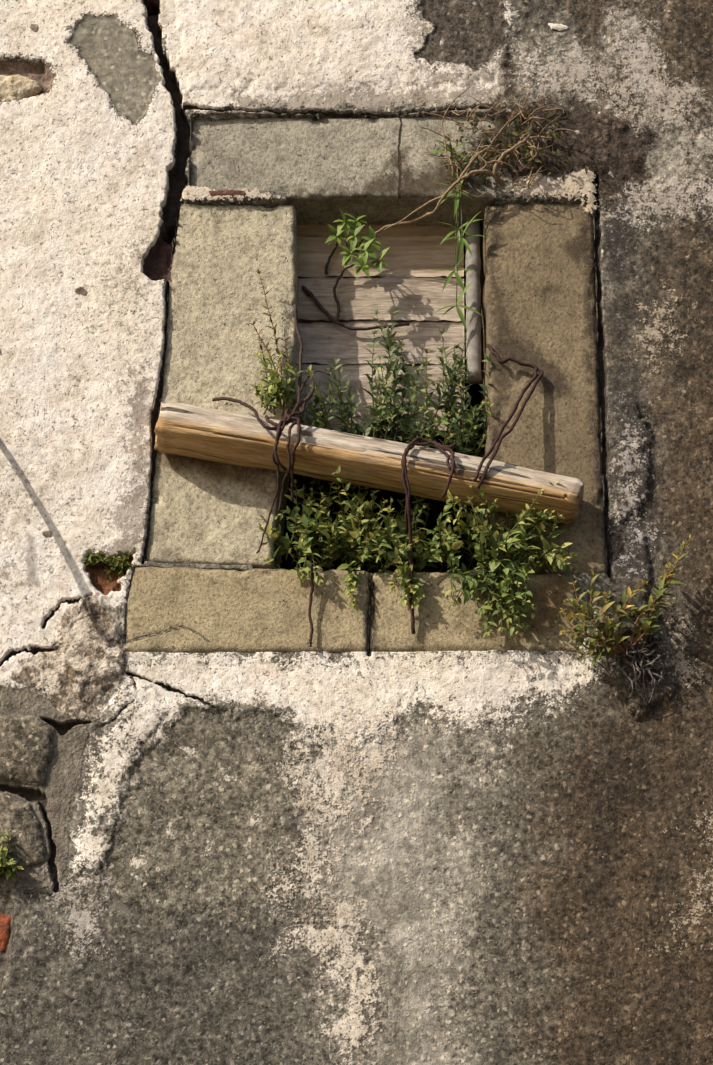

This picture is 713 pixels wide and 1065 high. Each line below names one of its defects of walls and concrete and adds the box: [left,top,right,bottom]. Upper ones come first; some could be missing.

spalling [0,60,55,102]
crack [143,0,489,242]
peeling [414,0,508,70]
crack [141,282,169,565]
water stain [340,9,713,711]
crack [0,595,91,667]
crack [44,625,223,736]
crack [0,784,59,893]
spalling [0,550,140,993]
water stain [42,868,124,961]
water stain [259,682,407,1065]
water stain [637,803,713,956]